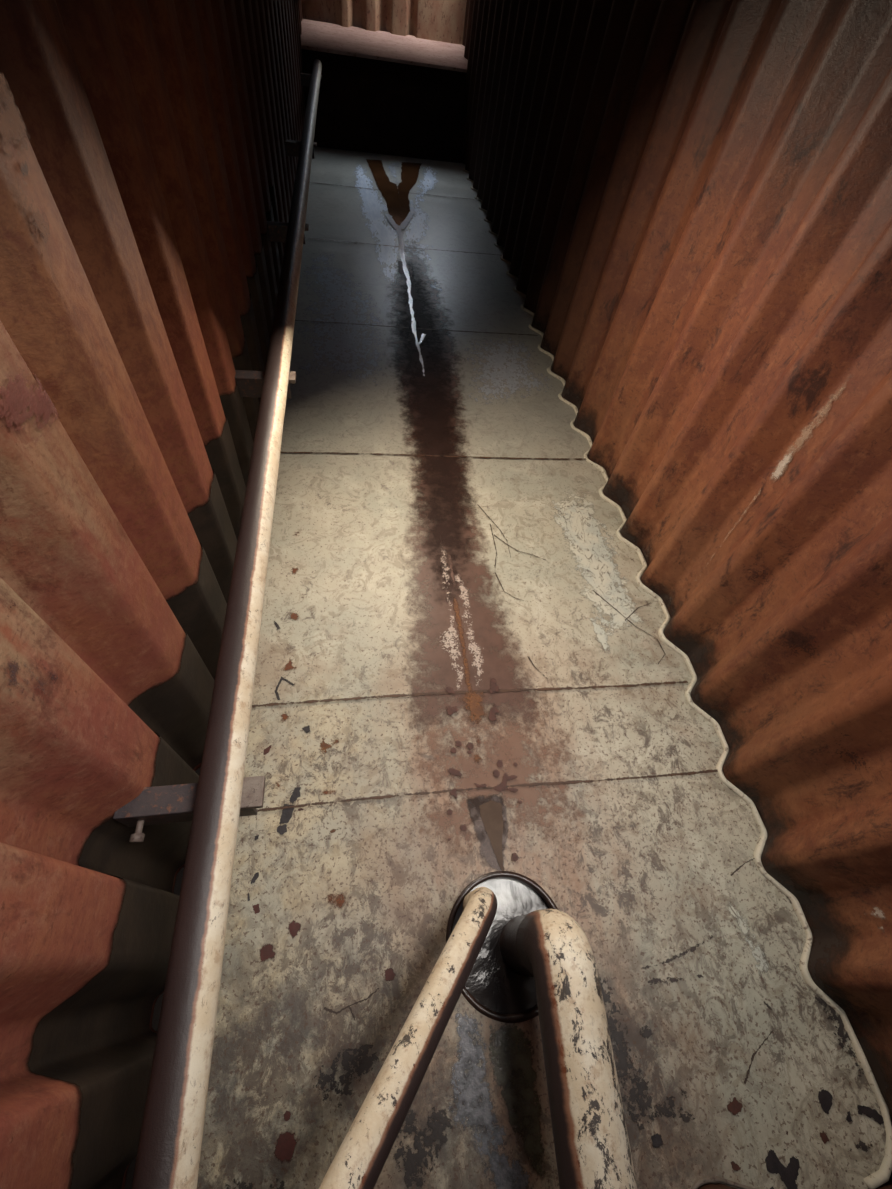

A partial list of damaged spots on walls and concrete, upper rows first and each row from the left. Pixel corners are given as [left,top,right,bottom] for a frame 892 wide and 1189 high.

rust [0,74,50,256]
damp [298,165,582,871]
crack [477,504,545,601]
rust [445,555,500,762]
crack [592,590,665,664]
rust [447,768,462,815]
rust [474,760,522,804]
peeling [818,1089,833,1114]
peeling [846,1105,884,1125]
peeling [765,1149,800,1189]